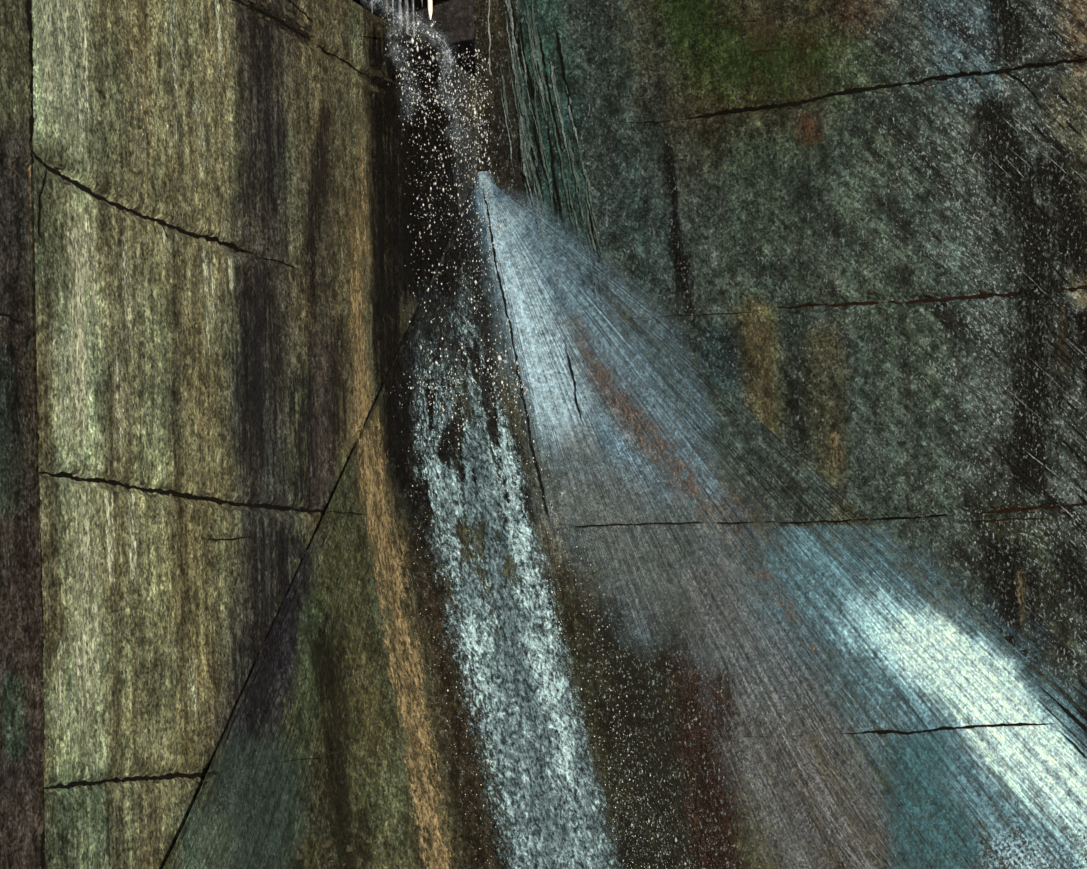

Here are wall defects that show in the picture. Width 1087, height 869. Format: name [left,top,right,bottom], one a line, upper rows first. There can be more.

crack [626,54,1087,123]
crack [483,189,1087,530]
leakage [715,619,908,869]
crack [796,723,1087,737]